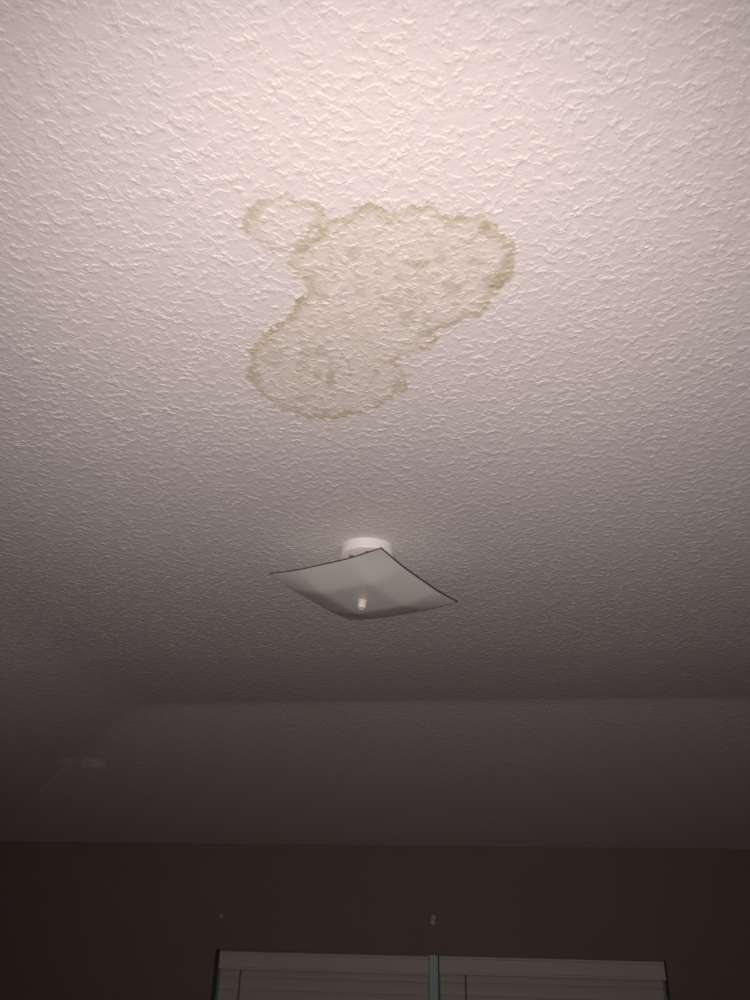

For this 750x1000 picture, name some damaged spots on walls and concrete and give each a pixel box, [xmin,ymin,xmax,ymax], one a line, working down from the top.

water stain [238,189,520,421]